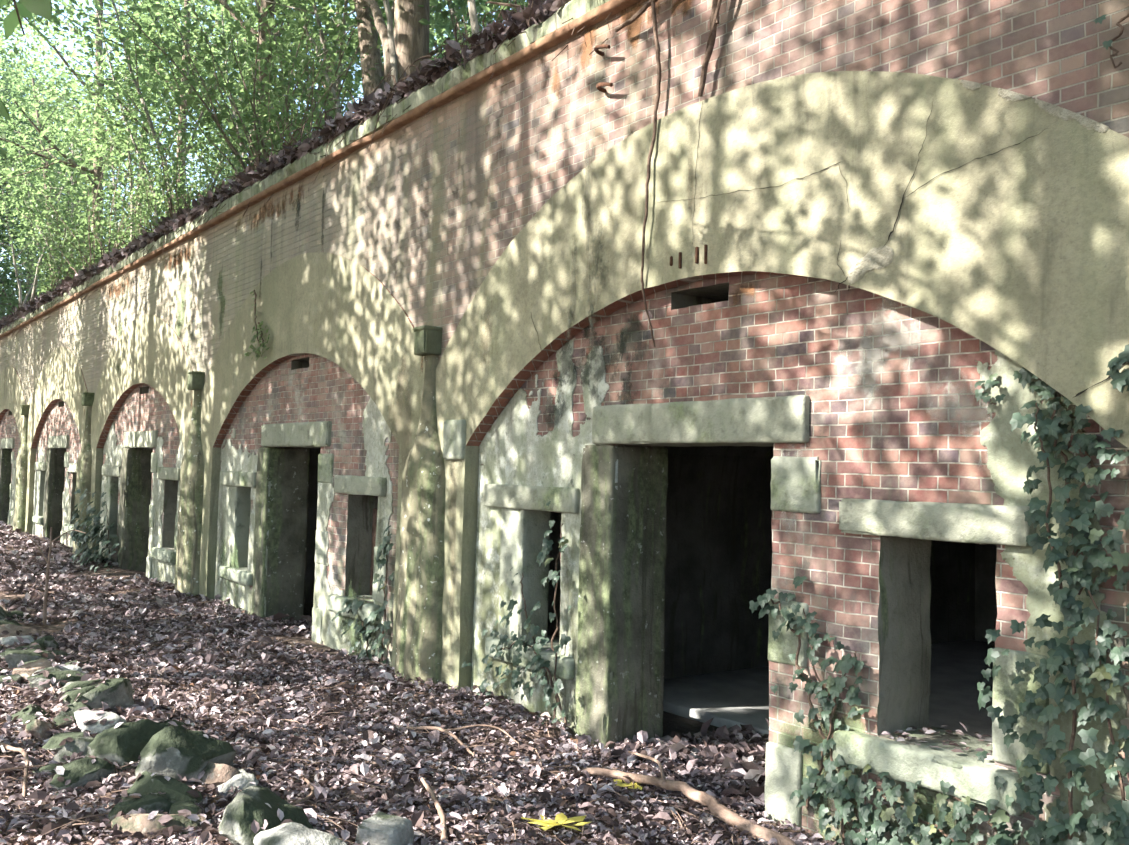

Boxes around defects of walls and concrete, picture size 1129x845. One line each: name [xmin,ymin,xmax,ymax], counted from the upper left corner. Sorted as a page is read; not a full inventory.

rust [581,29,595,67]
rust [621,0,691,48]
damp [585,148,604,279]
crack [657,102,849,245]
crack [878,102,1047,269]
damp [568,254,576,328]
damp [544,319,648,427]
crack [1075,361,1127,397]